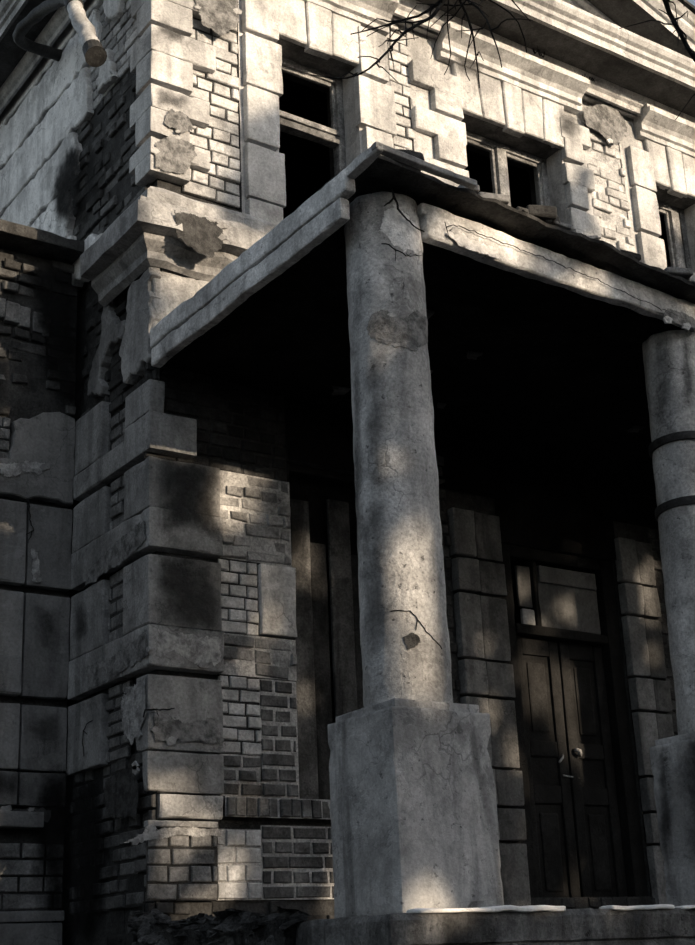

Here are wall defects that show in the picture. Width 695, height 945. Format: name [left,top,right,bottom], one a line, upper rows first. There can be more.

spalling [193,0,242,35]
spalling [150,108,197,174]
spalling [174,210,228,259]
crack [384,188,678,316]
spalling [366,310,428,351]
damp [163,458,219,535]
damp [160,557,218,627]
crack [390,610,442,649]
peeling [86,630,223,689]
spalling [121,676,225,746]
spalling [102,761,140,819]
peeling [124,825,221,845]